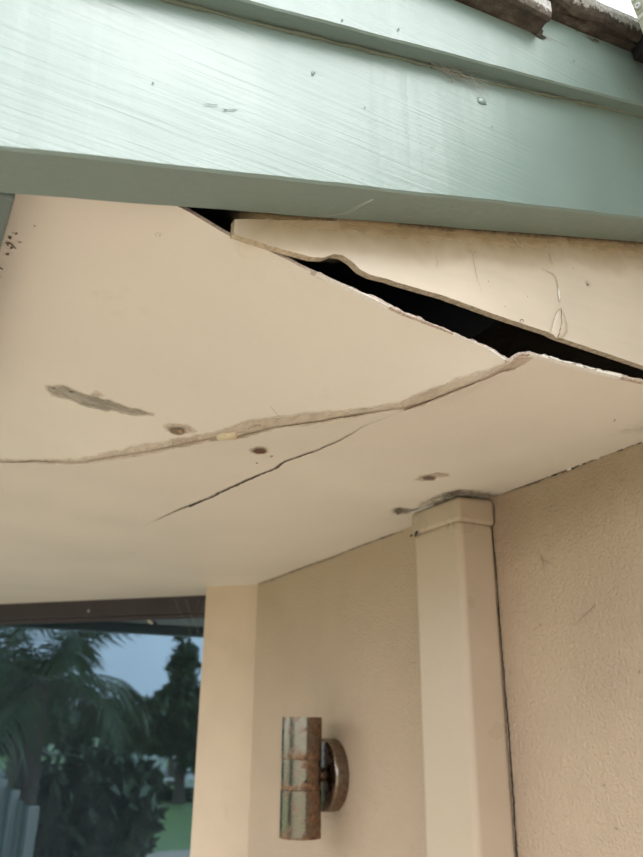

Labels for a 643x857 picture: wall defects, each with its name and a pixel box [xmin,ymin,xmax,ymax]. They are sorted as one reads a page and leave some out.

crack [544,240,562,338]
crack [10,438,214,463]
crack [146,368,515,525]